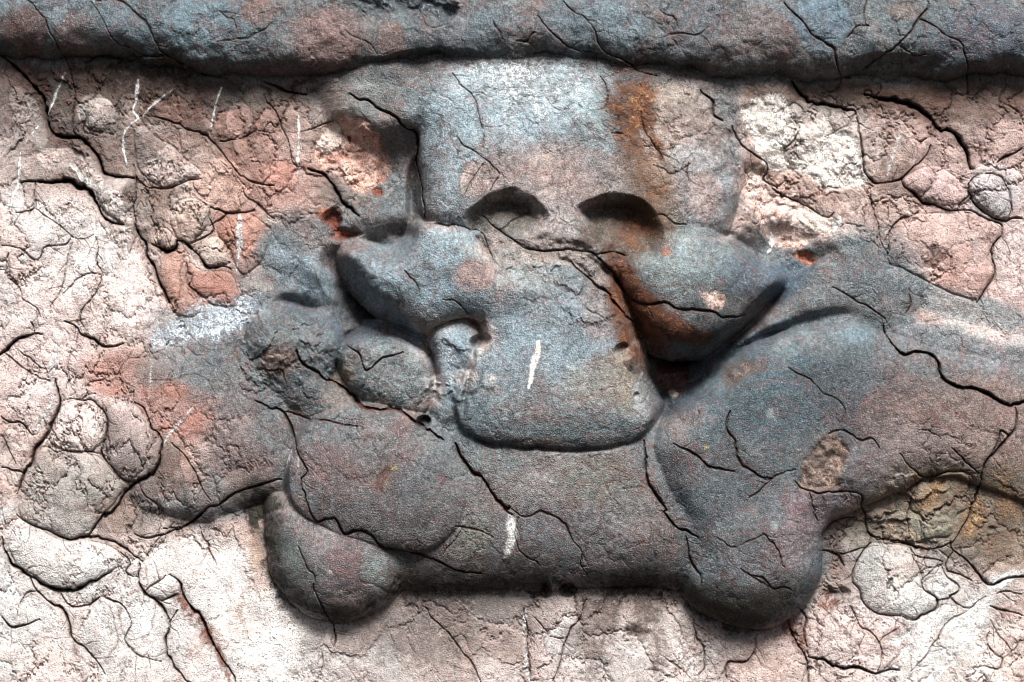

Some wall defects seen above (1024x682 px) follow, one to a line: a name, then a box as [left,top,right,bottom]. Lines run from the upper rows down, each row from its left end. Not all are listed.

crack [34,112,113,220]
crack [877,98,968,161]
crack [138,231,225,301]
crack [0,336,25,367]
crack [853,299,1024,406]
crack [19,373,108,486]
crack [283,352,516,540]
spalling [798,436,849,490]
crack [61,425,215,672]
crack [10,559,117,652]
crack [822,658,880,674]
crack [980,575,1023,667]